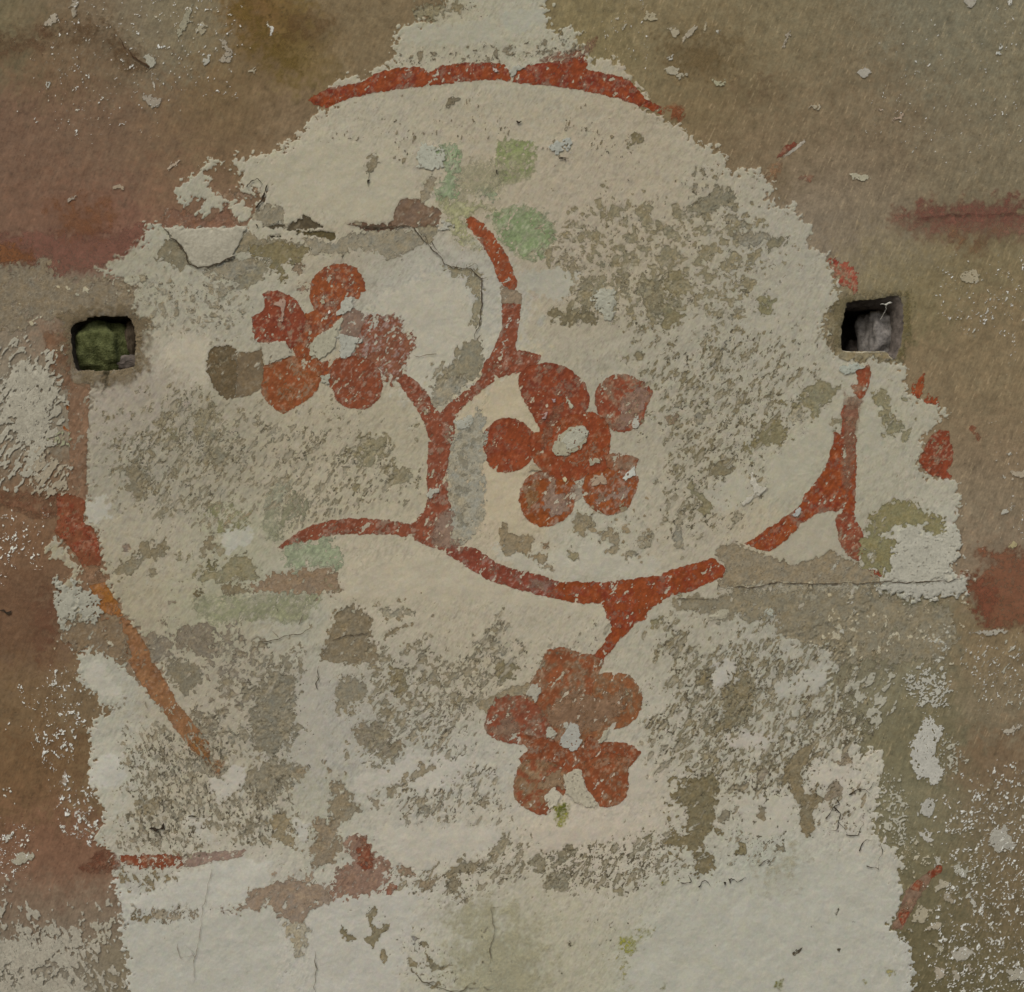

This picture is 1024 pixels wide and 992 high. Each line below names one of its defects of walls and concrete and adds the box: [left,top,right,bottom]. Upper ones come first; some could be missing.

peeling [43,0,79,36]
peeling [33,37,120,139]
peeling [106,0,243,108]
peeling [445,94,510,140]
crack [151,224,234,268]
crack [347,224,491,339]
peeling [0,120,489,605]
peeling [48,574,132,665]
peeling [107,166,1024,992]
crack [677,577,966,600]
peeling [17,670,104,847]
peeling [0,824,128,992]